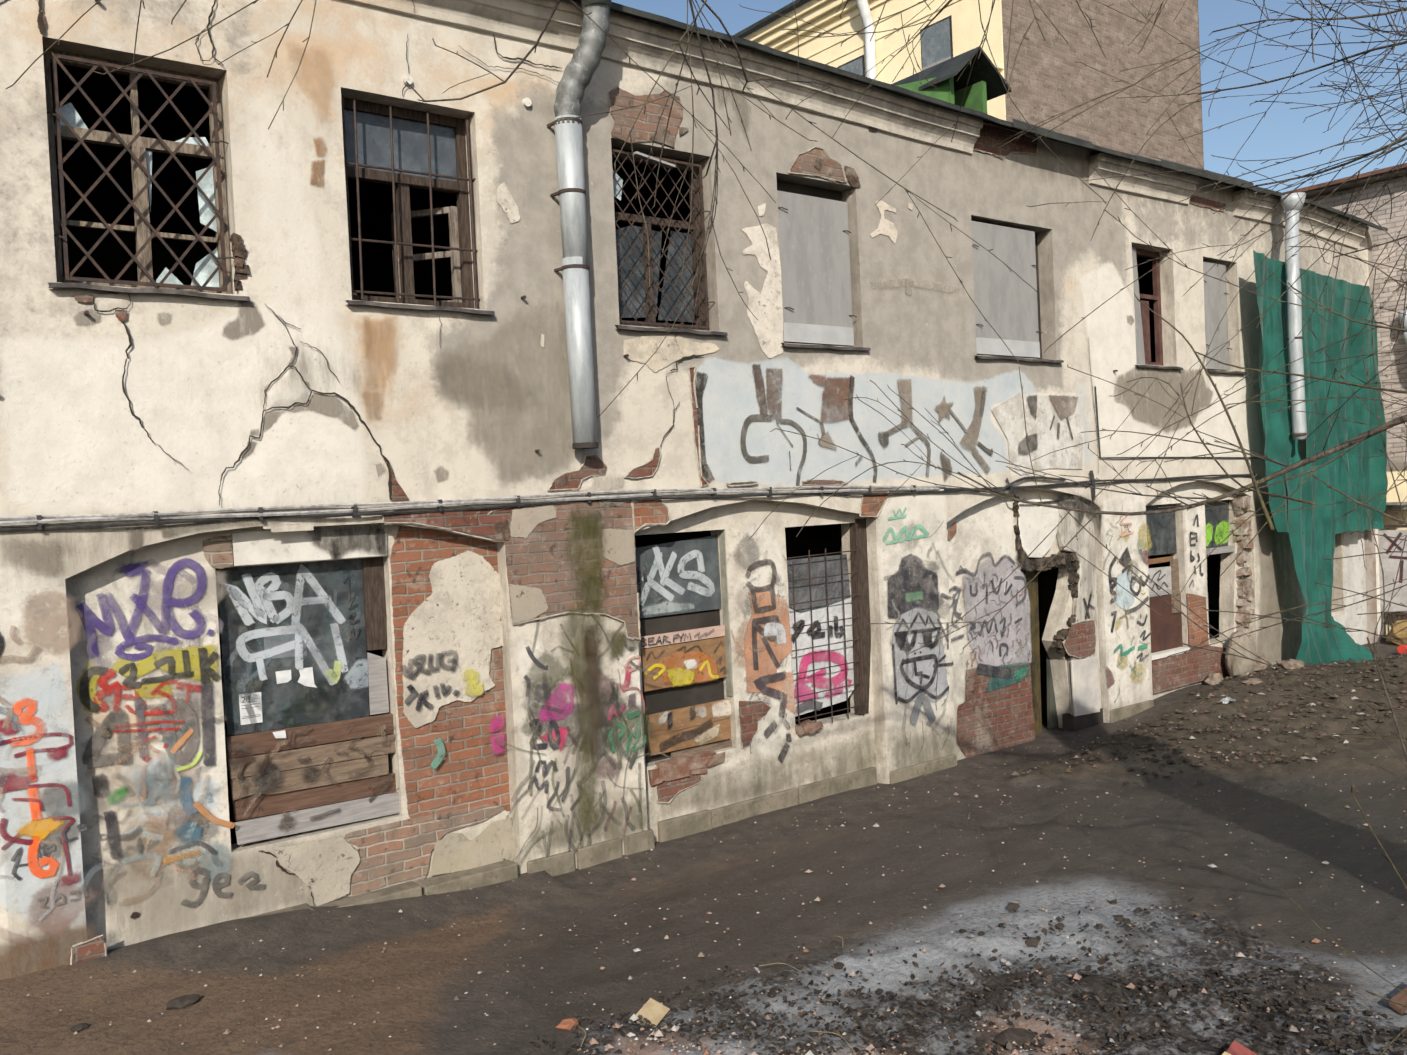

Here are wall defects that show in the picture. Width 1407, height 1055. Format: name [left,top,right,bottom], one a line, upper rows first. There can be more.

crack [37,0,46,35]
crack [195,0,224,66]
spalling [609,85,689,148]
spalling [789,146,861,187]
peeling [870,200,913,243]
peeling [742,203,783,358]
crack [74,292,409,506]
peeling [382,453,671,728]
damp [585,632,625,726]